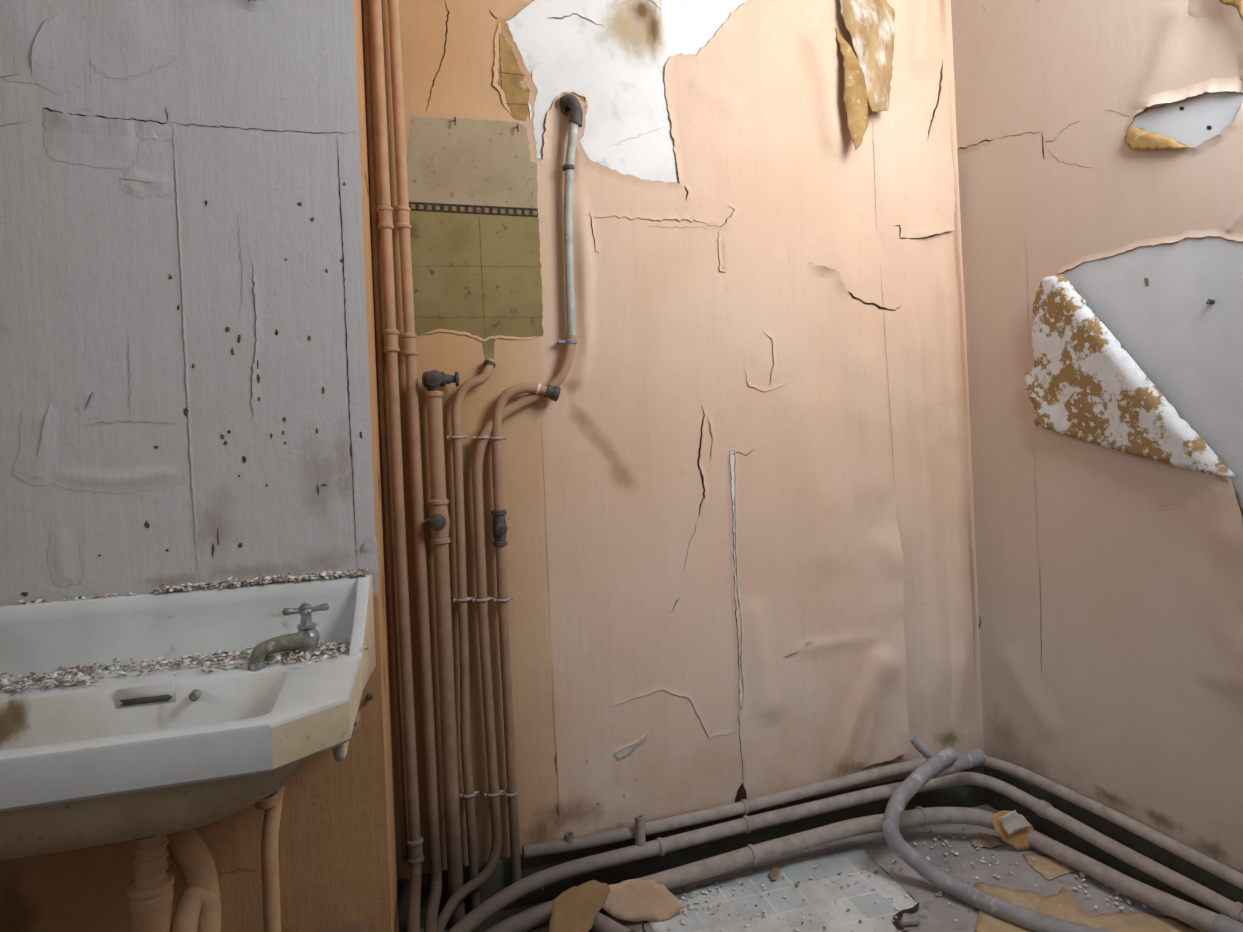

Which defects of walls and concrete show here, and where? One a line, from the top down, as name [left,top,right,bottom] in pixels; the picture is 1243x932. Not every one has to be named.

crack [178,0,288,12]
crack [426,0,450,111]
crack [547,9,603,25]
damp [610,0,659,50]
crack [927,60,1093,168]
crack [0,107,369,572]
crack [806,262,902,497]
crack [607,403,752,785]